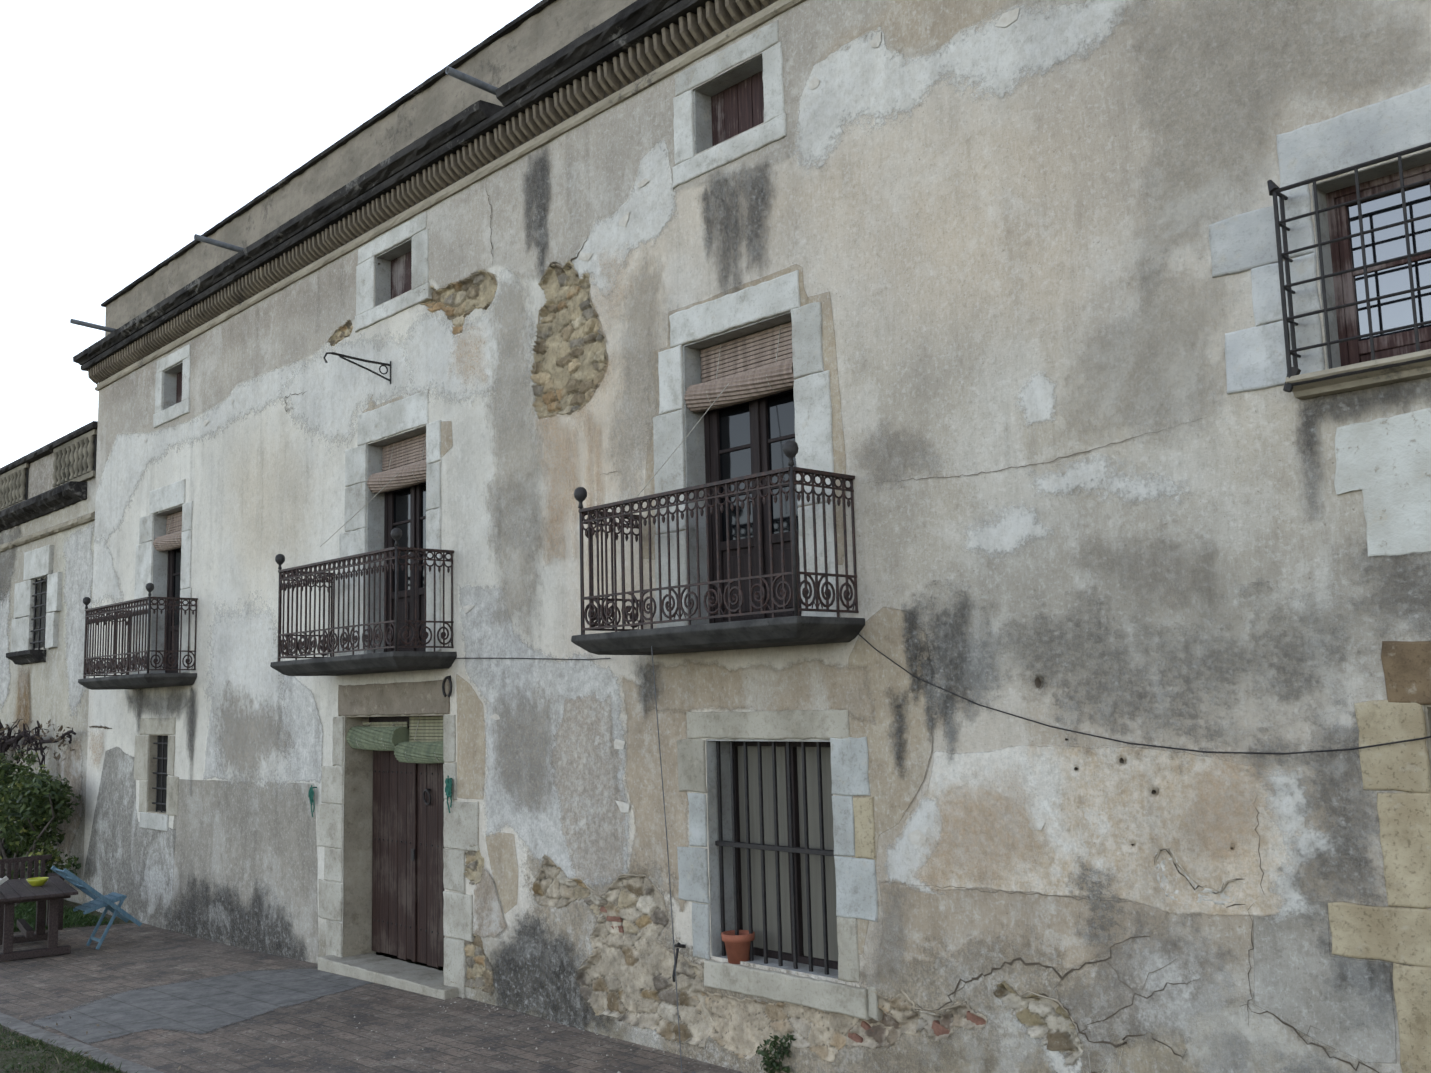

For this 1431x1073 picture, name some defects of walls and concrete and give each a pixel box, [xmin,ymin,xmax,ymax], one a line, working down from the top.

leakage [524,152,548,275]
leakage [702,168,770,292]
spalling [63,140,676,716]
leakage [487,283,553,624]
leakage [165,878,306,962]
flaking render [449,586,1123,1073]
crack [898,884,1198,1057]
leakage [892,580,1380,920]
crack [1154,789,1379,1073]